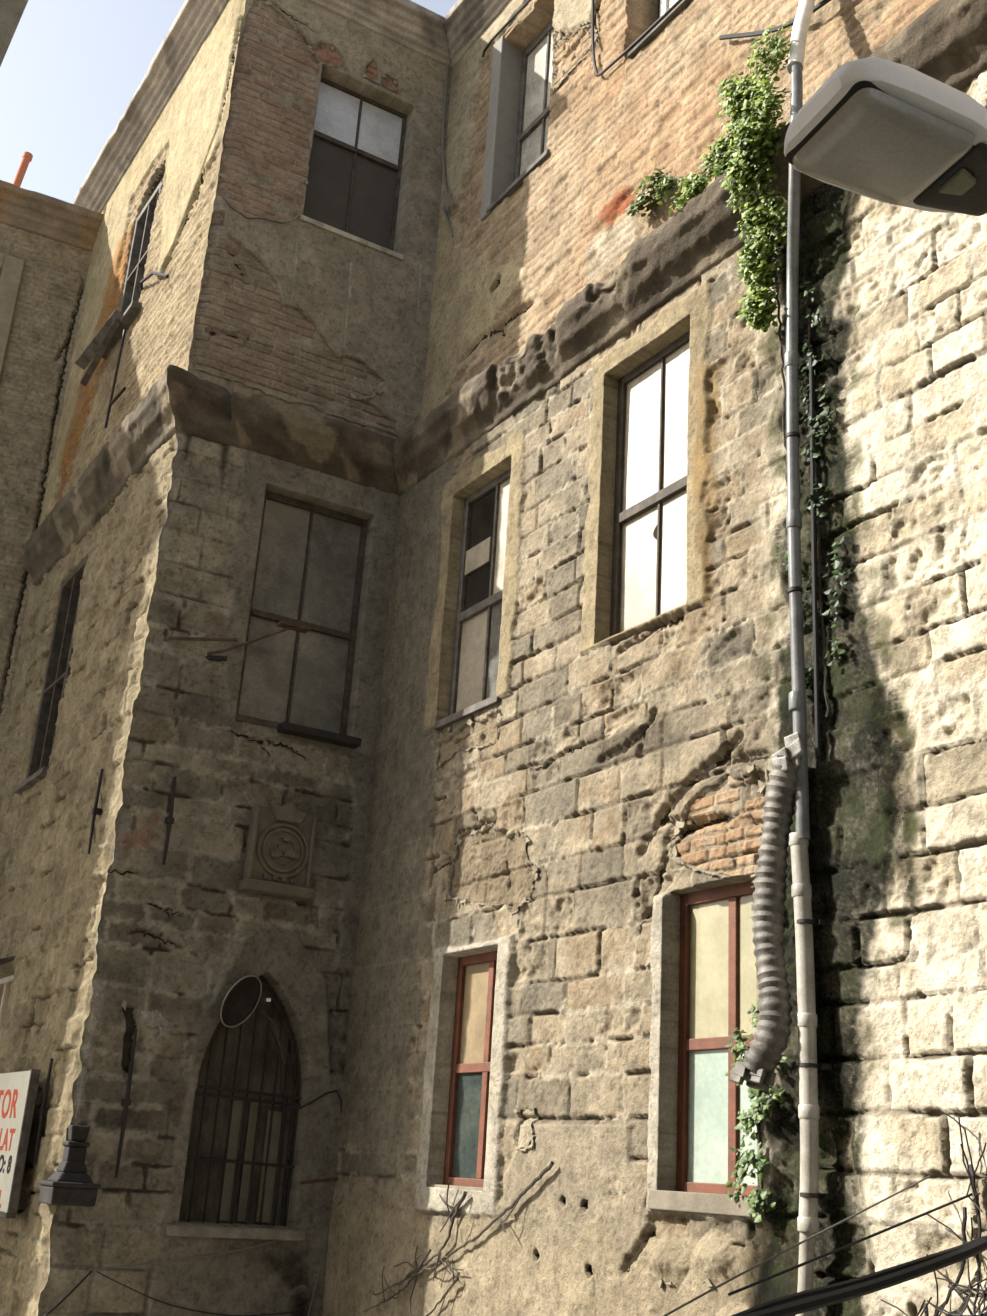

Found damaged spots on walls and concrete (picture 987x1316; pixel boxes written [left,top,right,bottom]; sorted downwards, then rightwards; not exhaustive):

spalling [190,0,401,436]
spalling [668,764,768,882]
leakage [748,183,918,1306]
leakage [811,1296,864,1316]